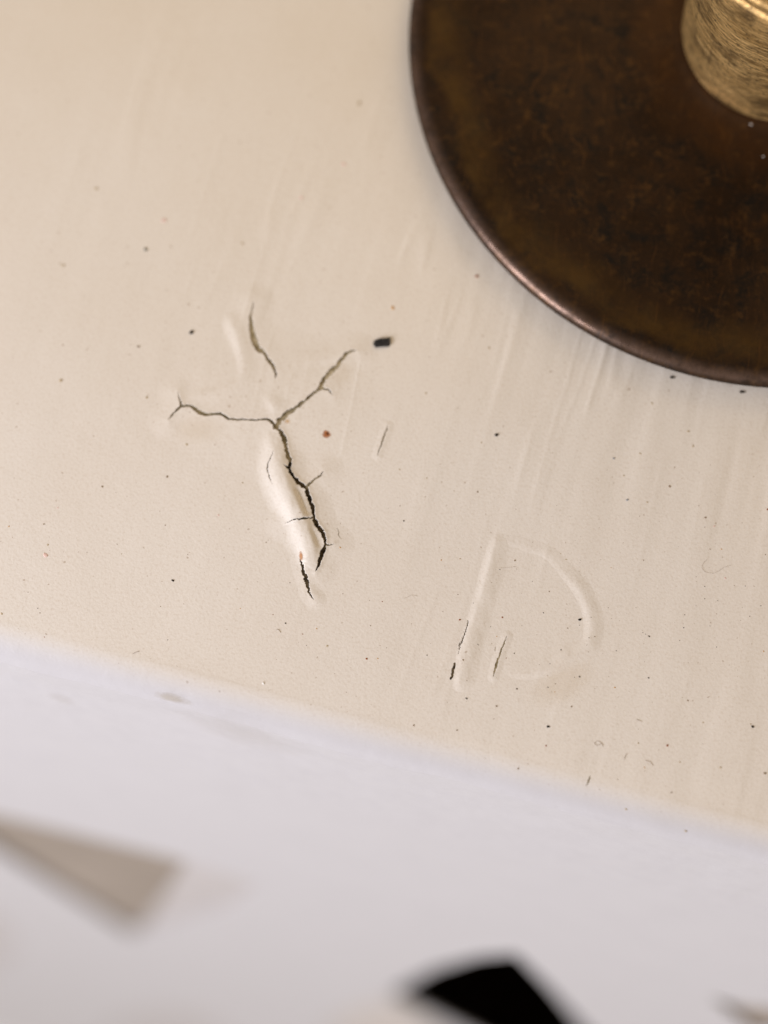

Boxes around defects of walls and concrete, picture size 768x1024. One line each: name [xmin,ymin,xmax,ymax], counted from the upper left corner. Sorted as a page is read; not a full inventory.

crack [249,302,277,379]
crack [169,350,357,599]
crack [450,622,469,680]
crack [487,630,513,683]